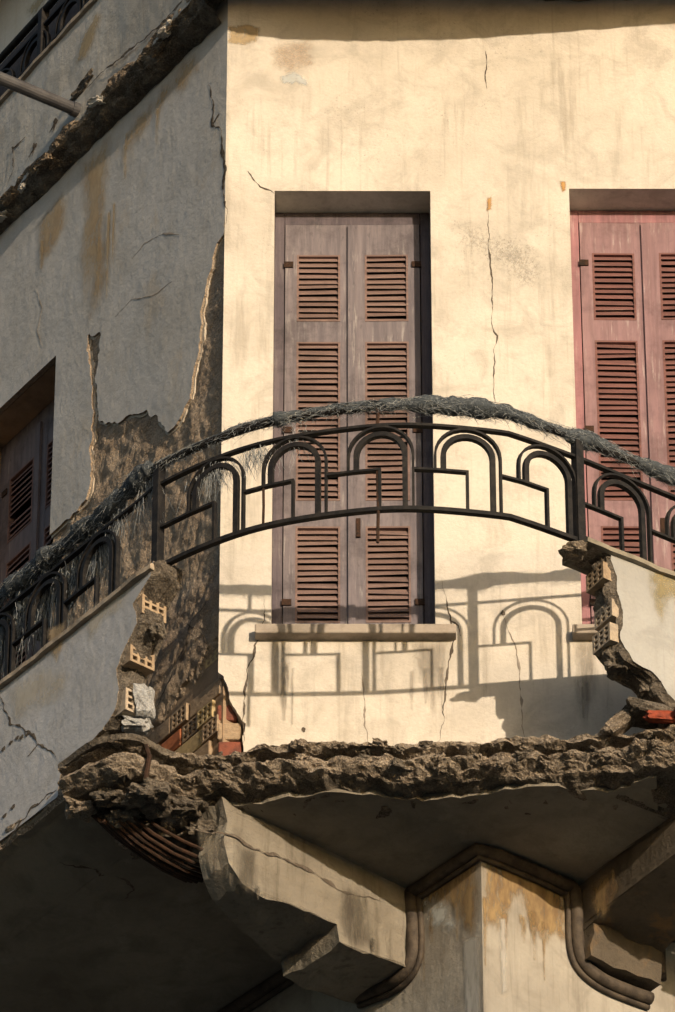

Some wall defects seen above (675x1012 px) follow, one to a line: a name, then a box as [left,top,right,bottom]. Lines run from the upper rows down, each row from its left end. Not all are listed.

spalling [0,0,224,235]
crack [208,84,271,222]
crack [487,206,498,399]
spalling [0,240,675,884]
crack [0,697,57,758]
crack [242,606,265,741]
crack [440,587,461,739]
crack [504,618,525,737]
crack [4,790,56,849]